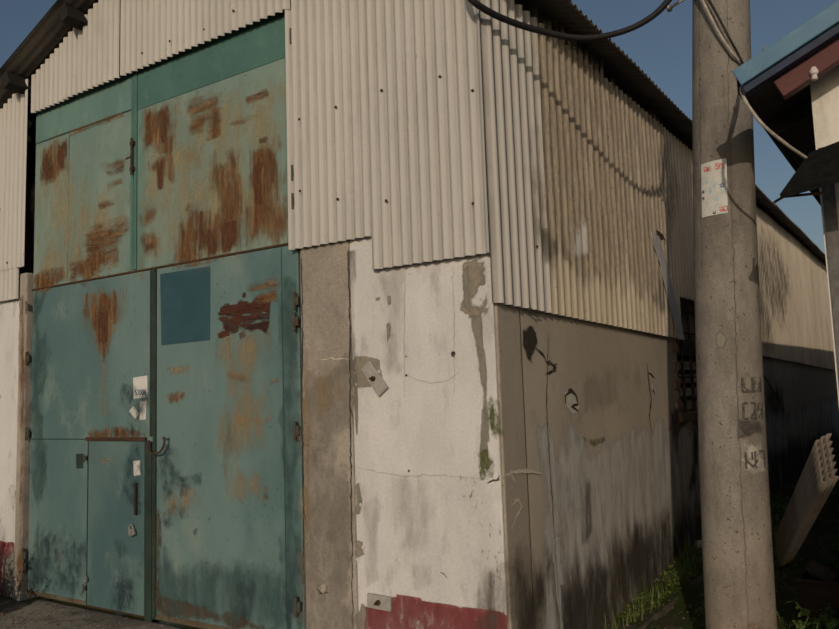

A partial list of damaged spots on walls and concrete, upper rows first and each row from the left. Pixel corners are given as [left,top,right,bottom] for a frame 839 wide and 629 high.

corrosion [41,127,85,182]
corrosion [144,106,173,189]
corrosion [176,137,285,267]
water stain [535,27,675,309]
corrosion [35,218,127,291]
corrosion [84,291,119,356]
peeling [460,258,489,469]
spalling [523,326,556,373]
crack [301,252,559,627]
water stain [768,431,839,497]
water stain [516,568,545,629]
water stain [557,509,702,629]